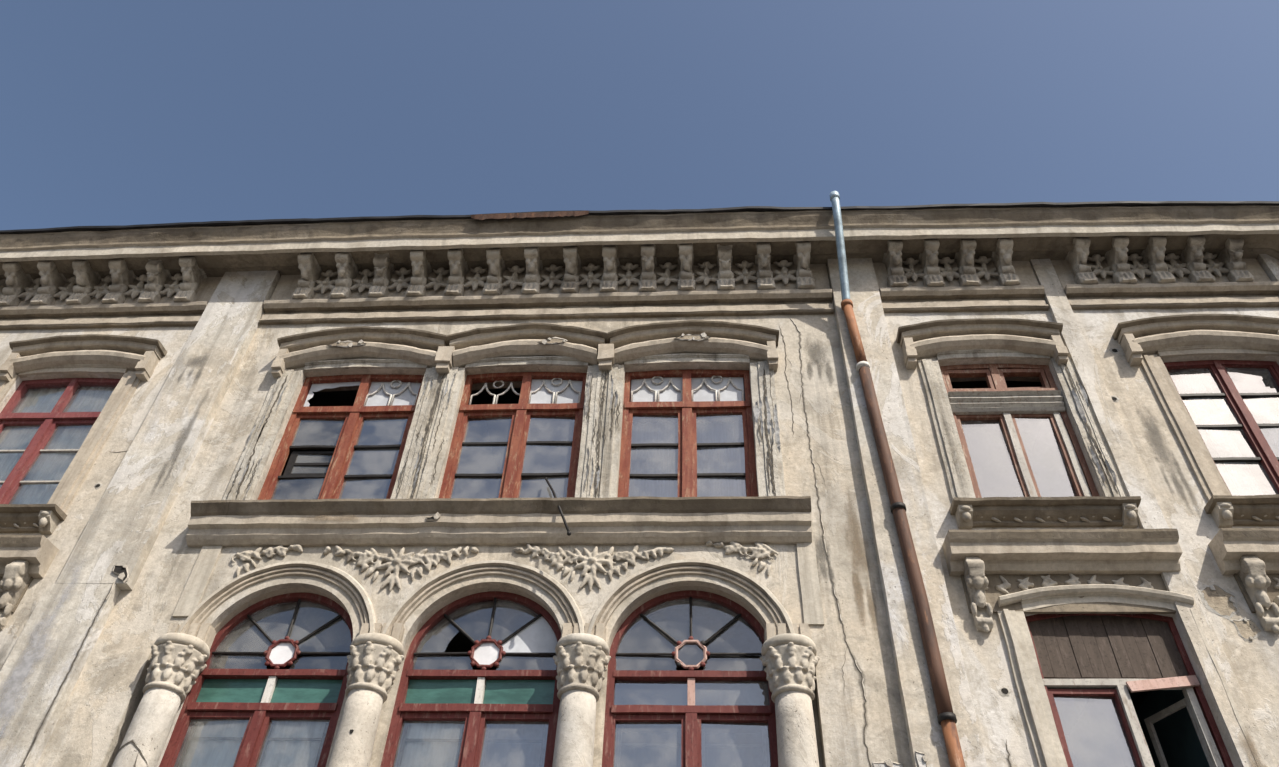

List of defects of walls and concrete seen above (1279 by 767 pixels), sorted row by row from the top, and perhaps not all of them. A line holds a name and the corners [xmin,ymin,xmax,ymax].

crack [779,318,872,767]
flaking render [872,751,927,767]